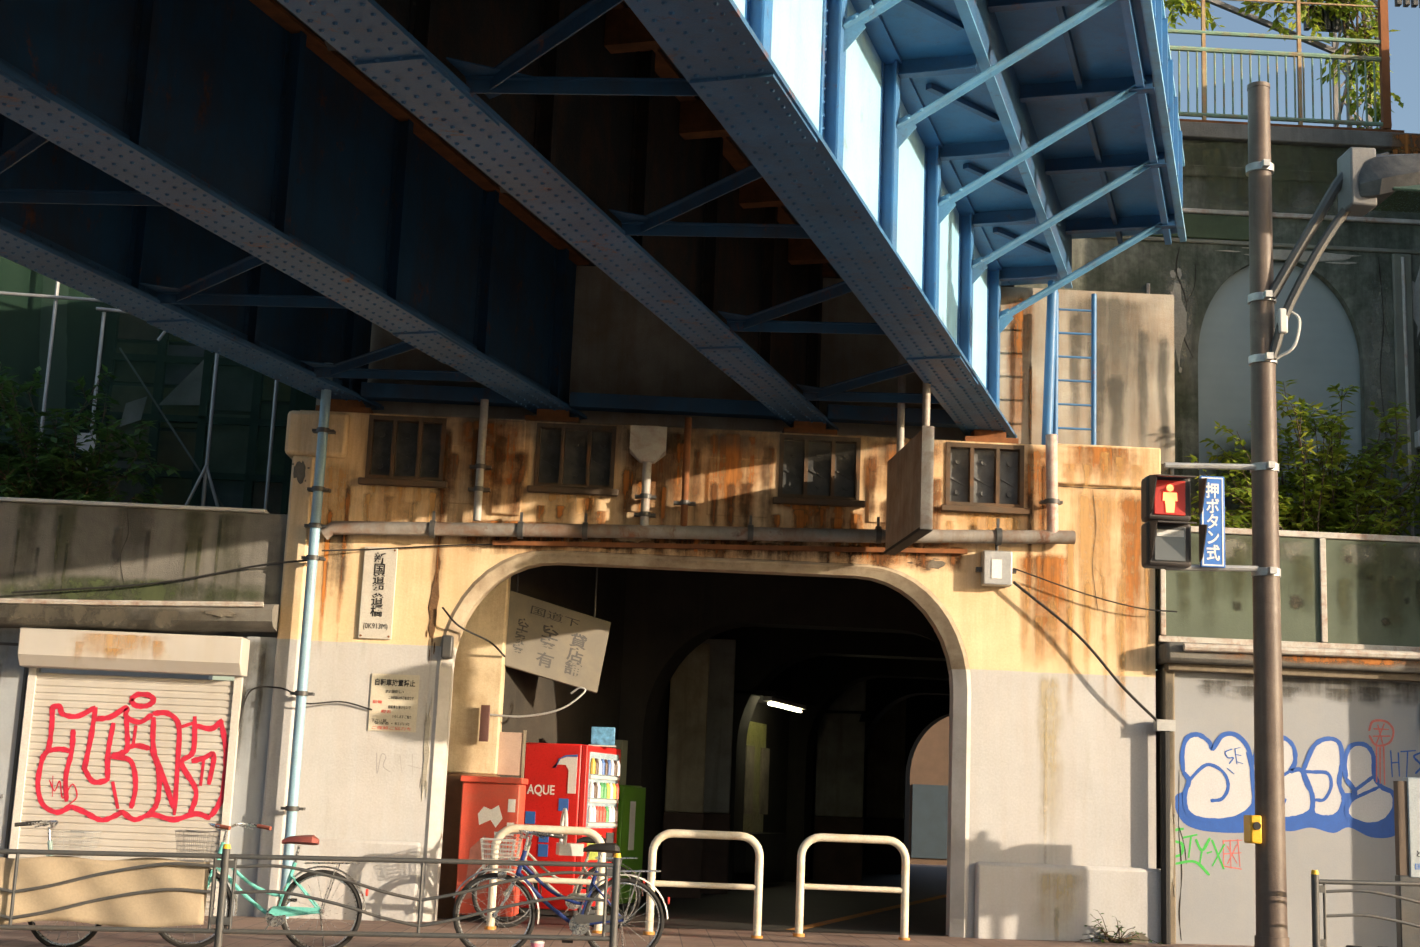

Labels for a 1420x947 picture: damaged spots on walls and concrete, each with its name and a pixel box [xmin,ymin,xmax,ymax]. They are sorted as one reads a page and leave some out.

rust [1393,134,1420,154]
water stain [185,512,230,581]
rust [321,465,351,617]
rust [435,420,634,581]
rust [622,433,963,569]
rust [968,298,1148,667]